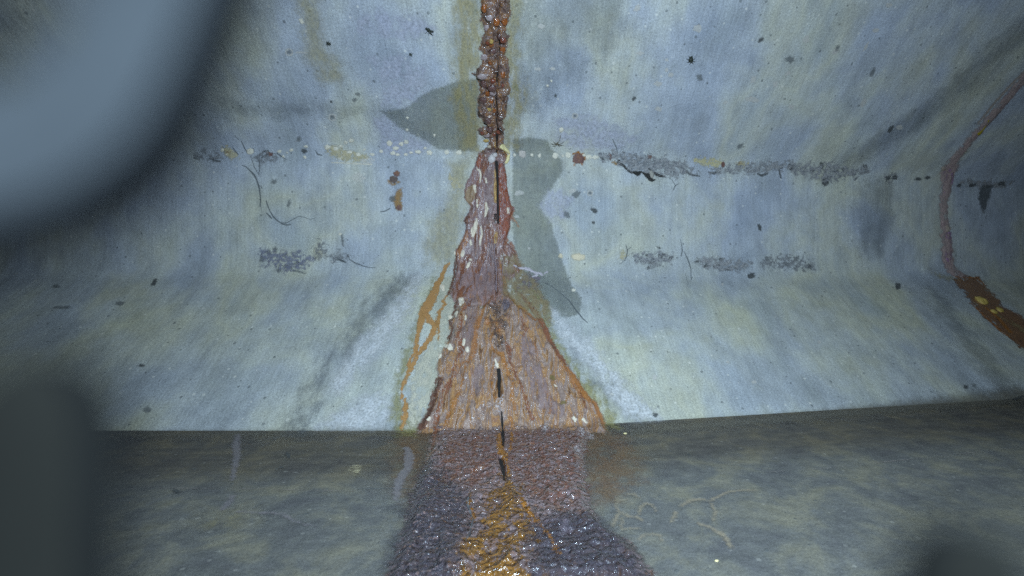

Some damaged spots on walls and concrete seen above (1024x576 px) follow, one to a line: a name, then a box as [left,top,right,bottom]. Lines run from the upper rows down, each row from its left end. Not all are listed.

crack [493,2,501,224]
spalling [598,149,871,186]
corrosion [385,0,653,576]
corrosion [953,274,1024,348]
crack [497,368,505,481]